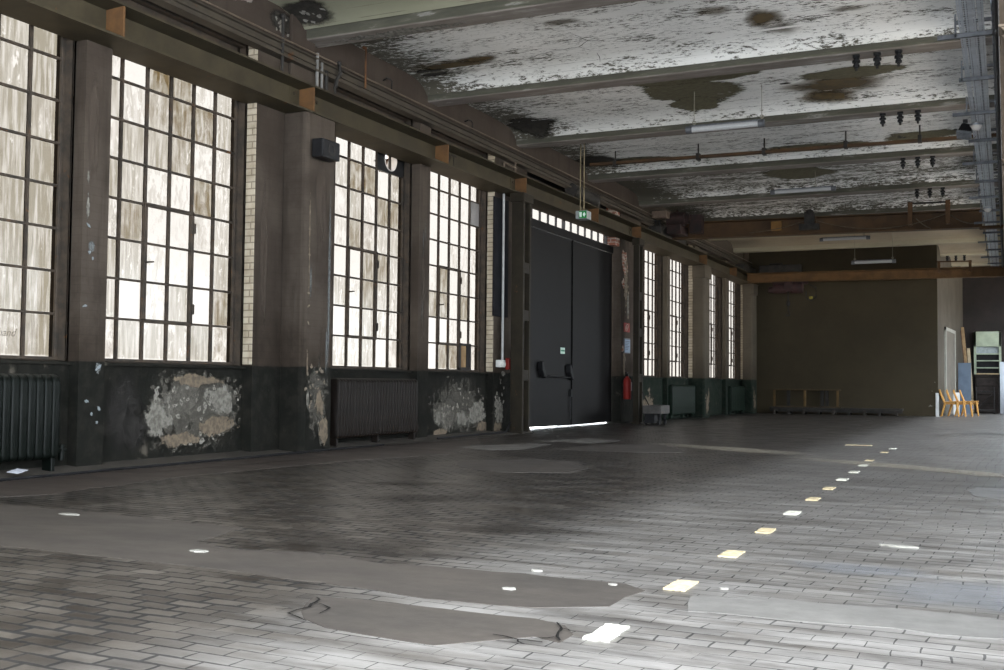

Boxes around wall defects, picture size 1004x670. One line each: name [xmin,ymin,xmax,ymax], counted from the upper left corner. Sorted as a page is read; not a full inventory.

peeling [629,71,760,112]
peeling [767,141,867,151]
peeling [885,129,957,141]
peeling [763,167,837,181]
peeling [140,370,242,453]
peeling [304,350,328,446]
peeling [428,371,506,435]
crack [285,597,331,621]
crack [494,622,569,644]